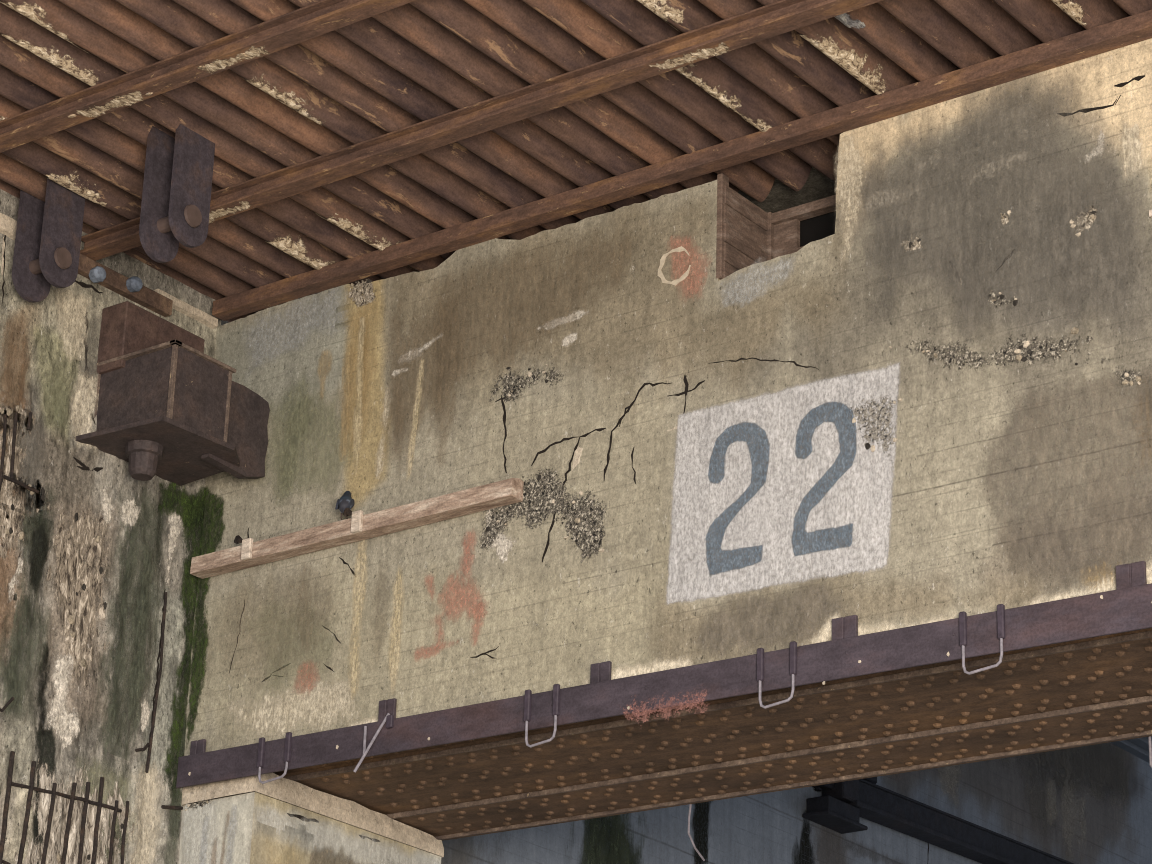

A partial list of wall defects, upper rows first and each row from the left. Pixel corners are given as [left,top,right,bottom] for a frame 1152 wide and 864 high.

leakage [838,137,974,283]
leakage [1121,124,1152,180]
spalling [0,403,110,690]
spalling [477,466,607,563]
crack [495,357,820,562]
leakage [989,381,1152,605]
spalling [135,592,167,773]
spalling [0,751,135,864]
leakage [307,828,416,864]
leakage [582,815,634,864]